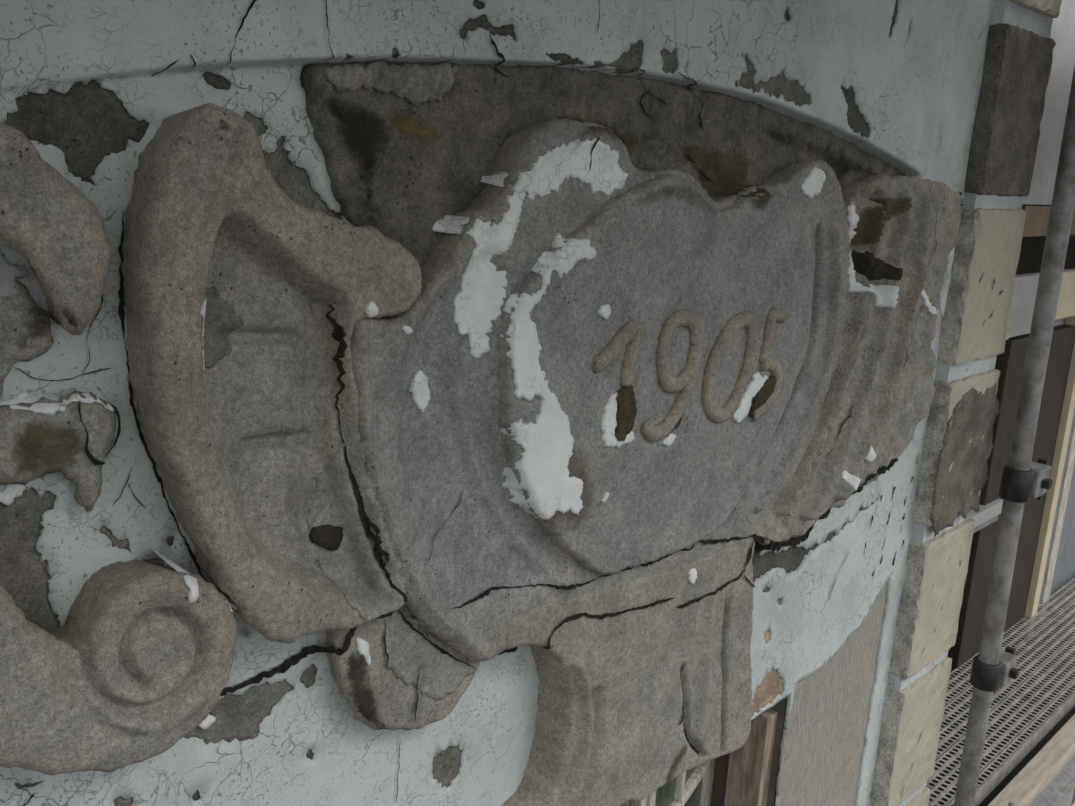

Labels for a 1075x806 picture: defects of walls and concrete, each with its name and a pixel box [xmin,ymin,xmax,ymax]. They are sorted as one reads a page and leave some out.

crack [151,0,257,77]
crack [490,35,508,77]
peeling [3,80,150,185]
spalling [844,202,903,308]
peeling [432,138,628,520]
spalling [0,484,60,633]
crack [209,303,474,714]
peeling [307,421,476,701]
crack [453,458,899,655]
spalling [184,664,317,744]
crack [396,669,421,801]
crack [679,706,699,754]